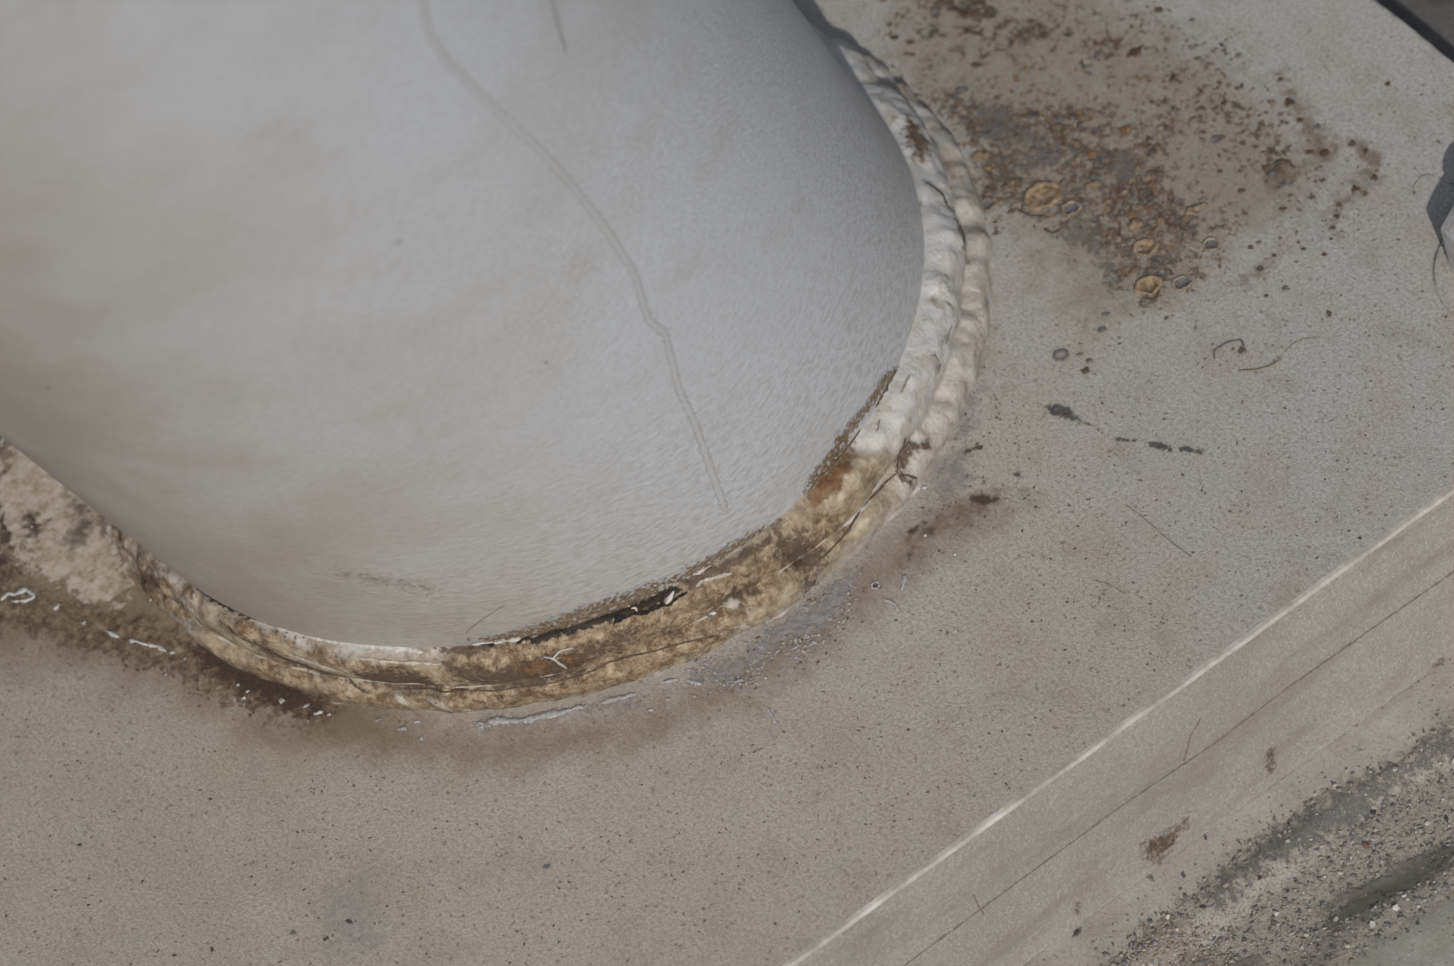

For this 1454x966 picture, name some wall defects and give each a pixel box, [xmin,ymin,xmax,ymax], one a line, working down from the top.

crack [195,534,771,694]
corrosion [276,796,461,954]
corrosion [625,731,838,957]
corrosion [849,677,1011,852]